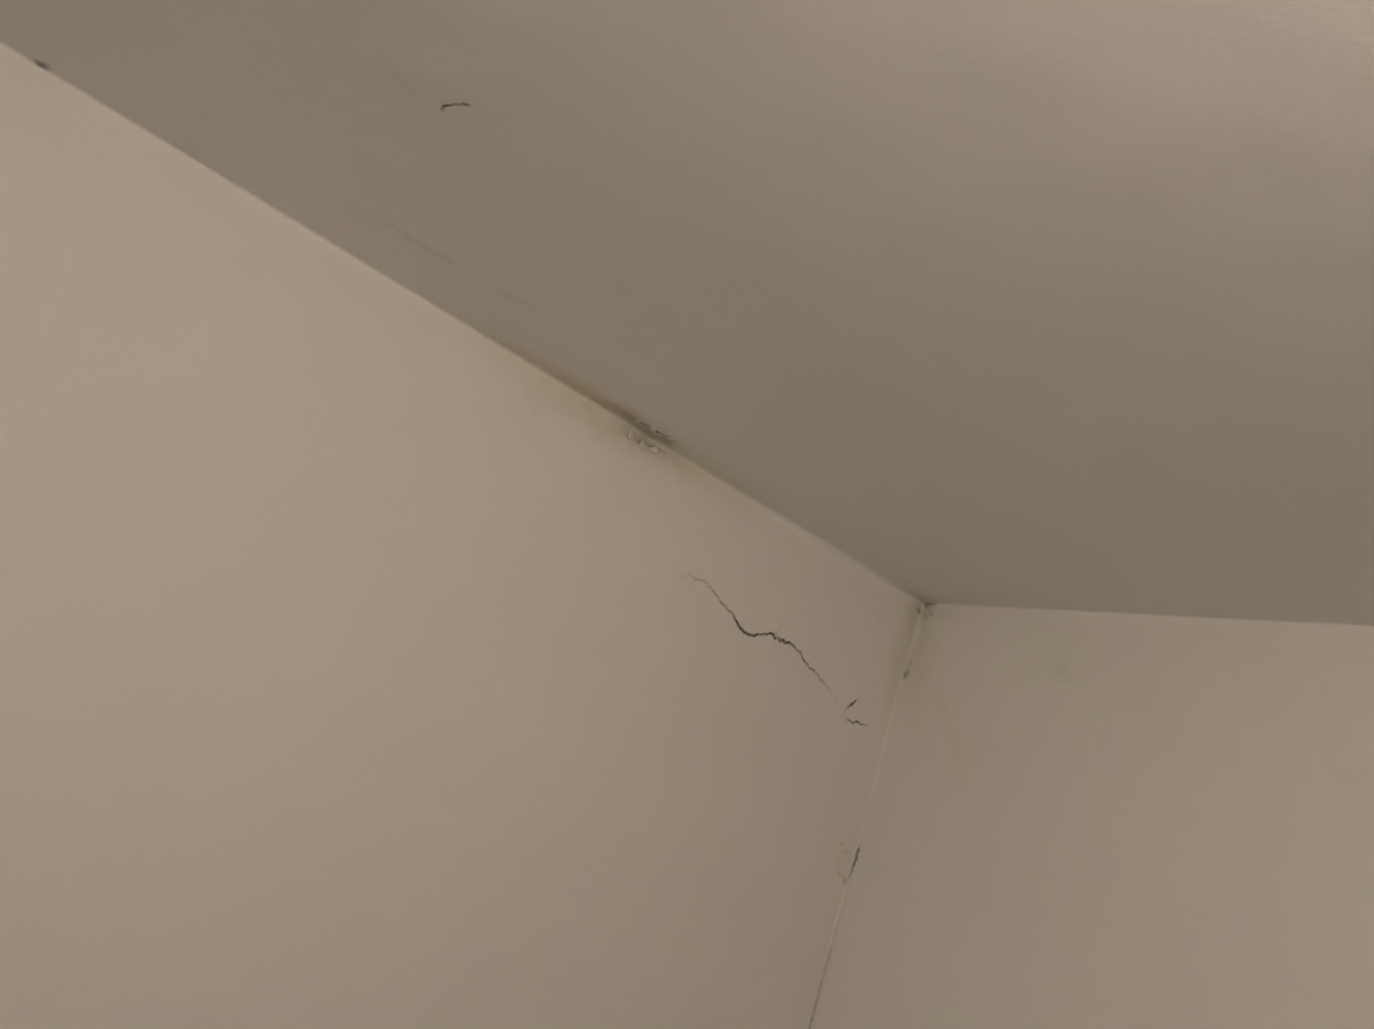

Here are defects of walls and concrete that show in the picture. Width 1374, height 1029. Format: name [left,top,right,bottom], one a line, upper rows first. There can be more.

crack [735,619,814,671]